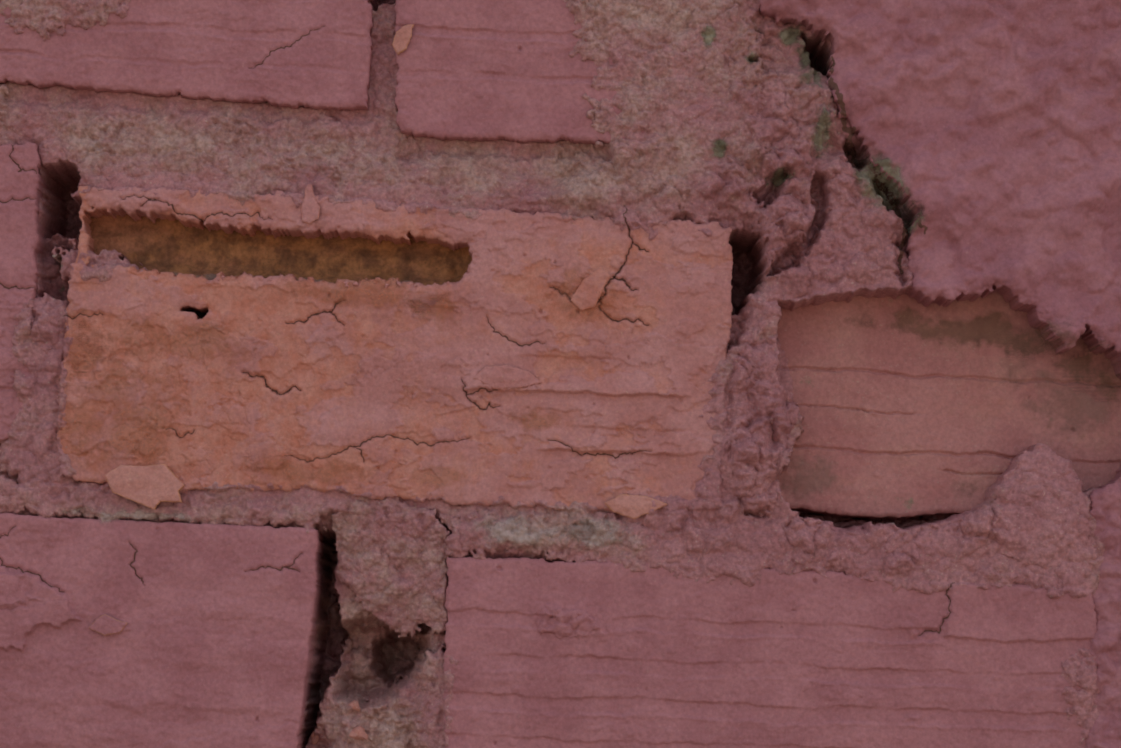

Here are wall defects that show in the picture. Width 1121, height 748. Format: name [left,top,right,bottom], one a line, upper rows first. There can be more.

spalling [392,24,414,55]
crack [813,56,928,275]
spalling [90,184,472,288]
crack [550,205,649,326]
peeling [570,267,611,311]
crack [243,372,301,395]
crack [461,379,499,410]
peeling [473,365,542,389]
crack [284,434,469,463]
crack [547,439,645,459]
spalling [605,494,667,519]
peeling [0,572,79,650]